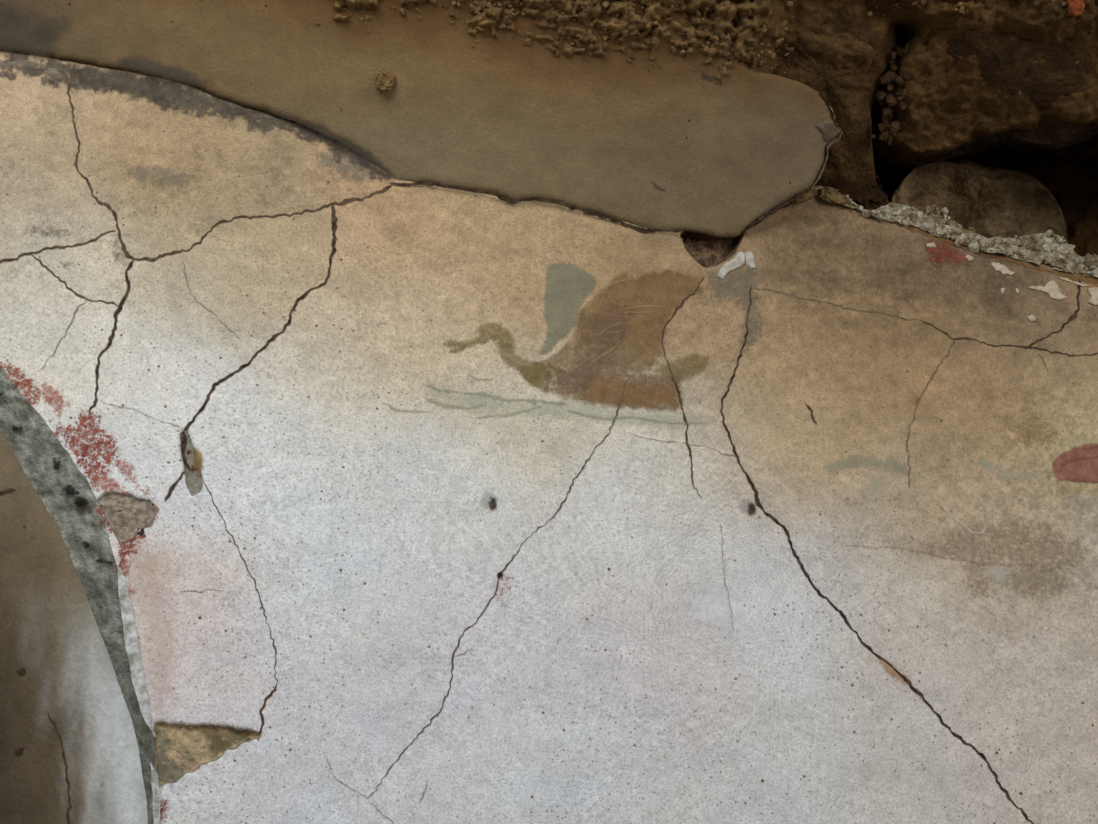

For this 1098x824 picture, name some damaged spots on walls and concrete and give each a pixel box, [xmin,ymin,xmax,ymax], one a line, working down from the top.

crack [0,74,680,431]
crack [741,188,812,235]
peeling [0,359,70,417]
spalling [63,460,159,576]
crack [165,471,278,740]
crack [327,377,629,822]
crack [637,277,1098,824]
crack [46,711,71,824]
spalling [154,722,261,787]